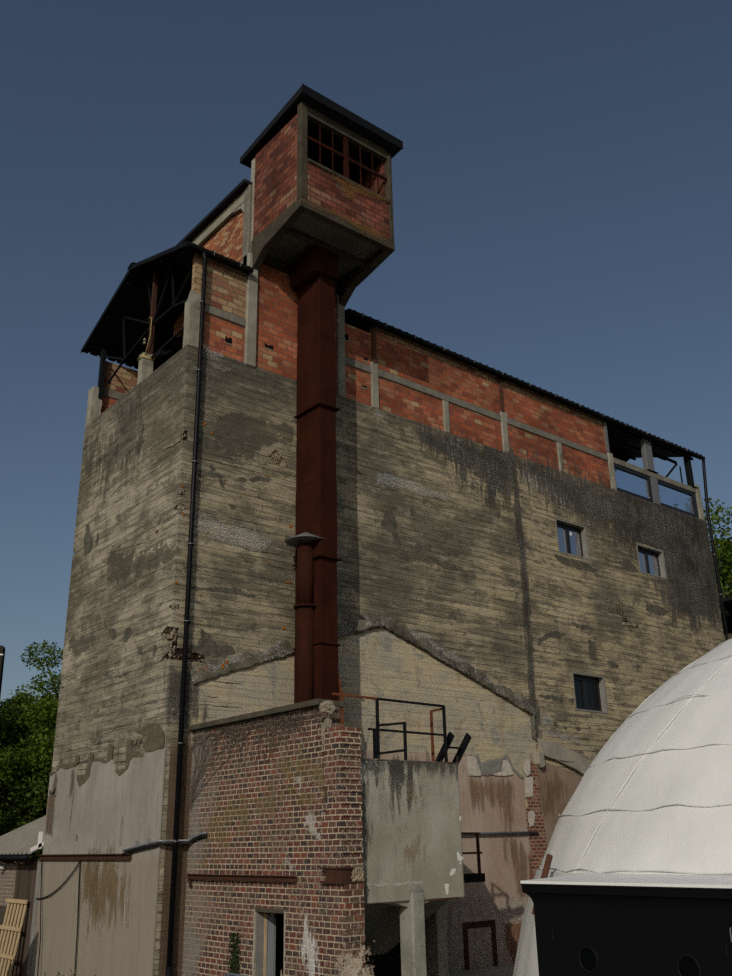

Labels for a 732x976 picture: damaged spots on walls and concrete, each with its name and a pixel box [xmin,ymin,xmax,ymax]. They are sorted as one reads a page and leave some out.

peeling [108,627,132,642]
peeling [137,627,235,662]
damp [417,426,728,743]
flaking render [31,722,166,976]
damp [361,751,458,859]
flaking render [362,749,547,972]